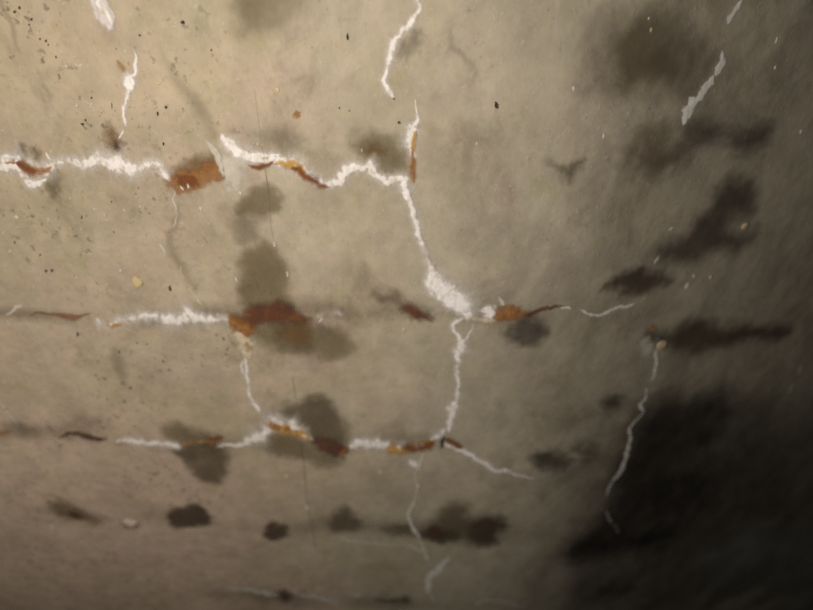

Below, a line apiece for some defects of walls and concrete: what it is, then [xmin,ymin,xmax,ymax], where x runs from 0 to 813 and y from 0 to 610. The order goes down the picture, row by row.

crack [381,0,422,97]
crack [0,53,178,226]
rust [167,157,224,193]
leakage [206,134,281,192]
leakage [240,245,288,306]
crack [96,243,313,449]
rust [226,302,307,342]
rust [402,305,428,319]
crack [230,98,636,603]
leakage [281,396,343,441]
rust [313,438,349,457]
leakage [168,504,210,528]